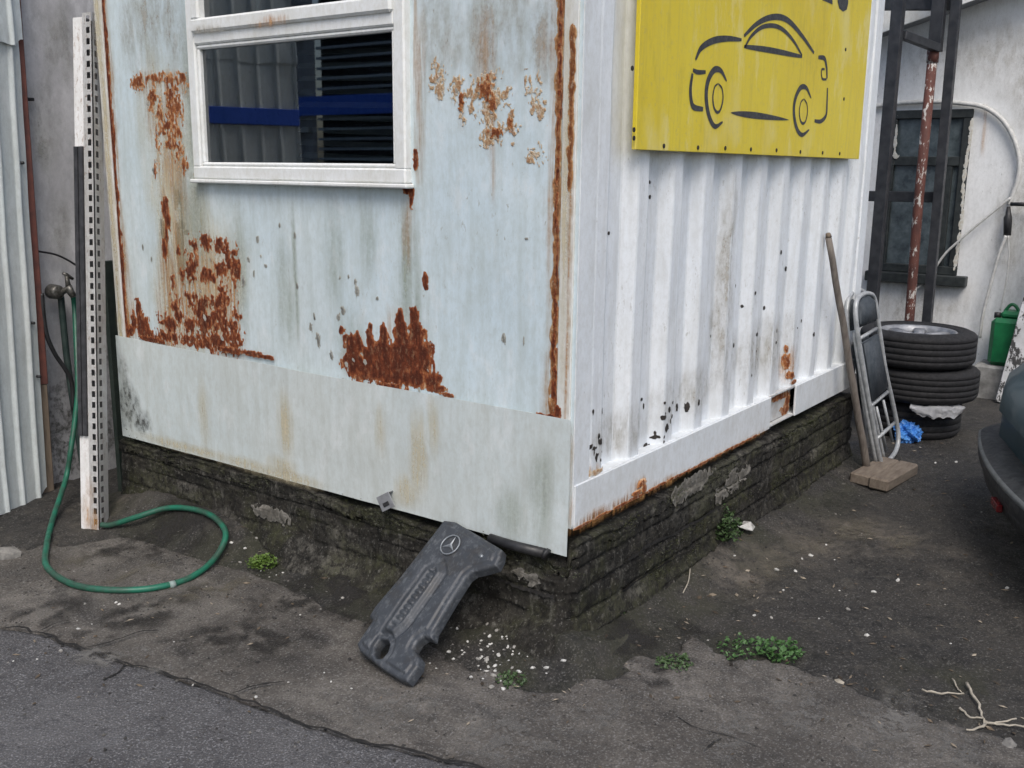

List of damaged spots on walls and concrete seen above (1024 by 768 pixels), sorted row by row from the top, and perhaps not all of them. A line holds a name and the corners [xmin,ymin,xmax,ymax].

corrosion [95,0,274,361]
corrosion [536,0,577,418]
corrosion [339,306,454,398]
peeling [643,400,700,447]
corrosion [771,345,797,416]
corrosion [573,434,760,531]
spalling [671,464,751,507]
crack [5,619,485,768]